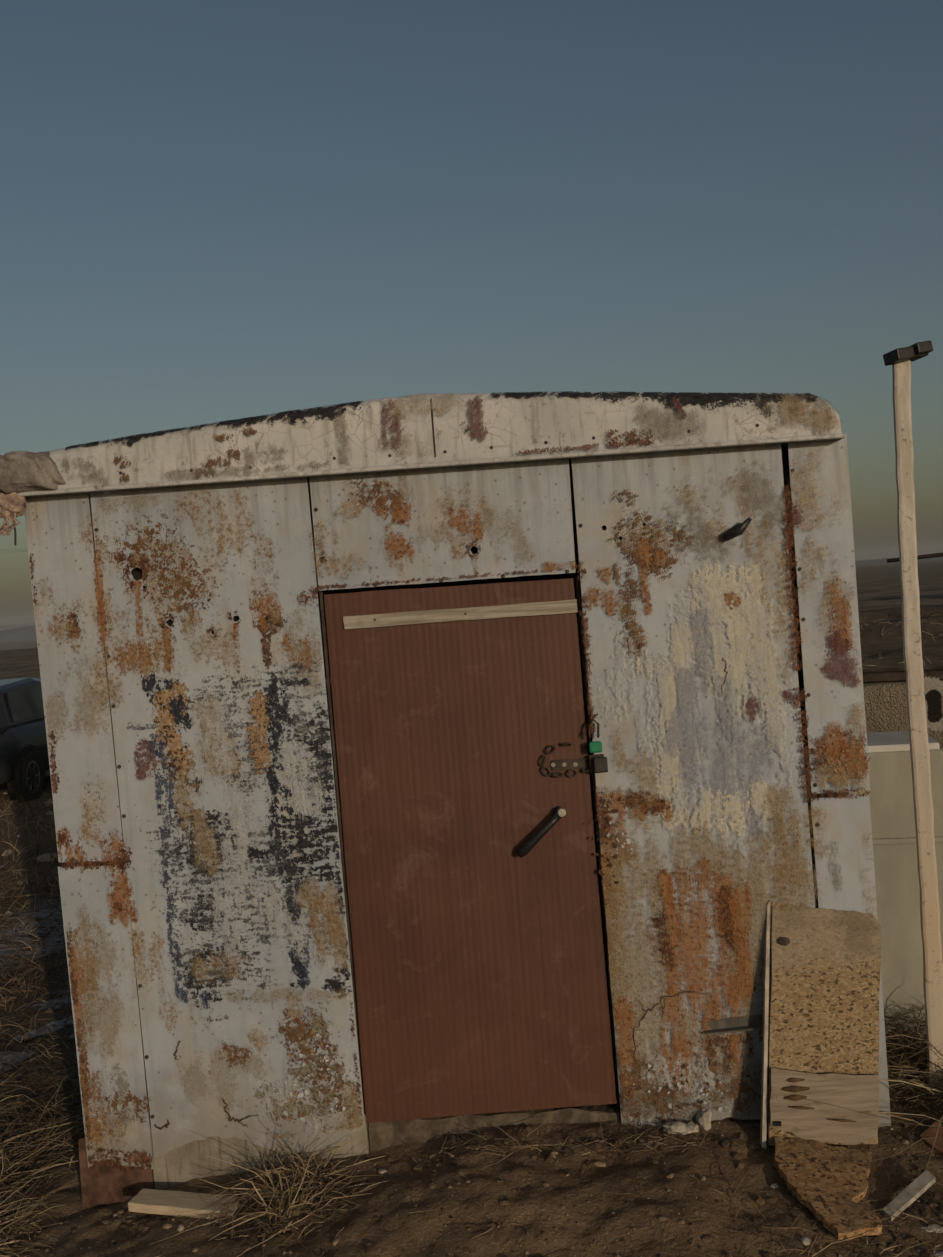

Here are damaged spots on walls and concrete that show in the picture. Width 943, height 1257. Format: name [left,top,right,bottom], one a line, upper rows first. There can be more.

corrosion [113,455,131,483]
corrosion [194,427,286,478]
corrosion [519,438,655,455]
corrosion [29,553,52,605]
corrosion [40,491,281,705]
corrosion [282,631,315,673]
peeling [152,681,272,783]
corrosion [48,731,60,794]
corrosion [296,452,870,1133]
corrosion [57,784,164,1171]
corrosion [219,1030,266,1068]